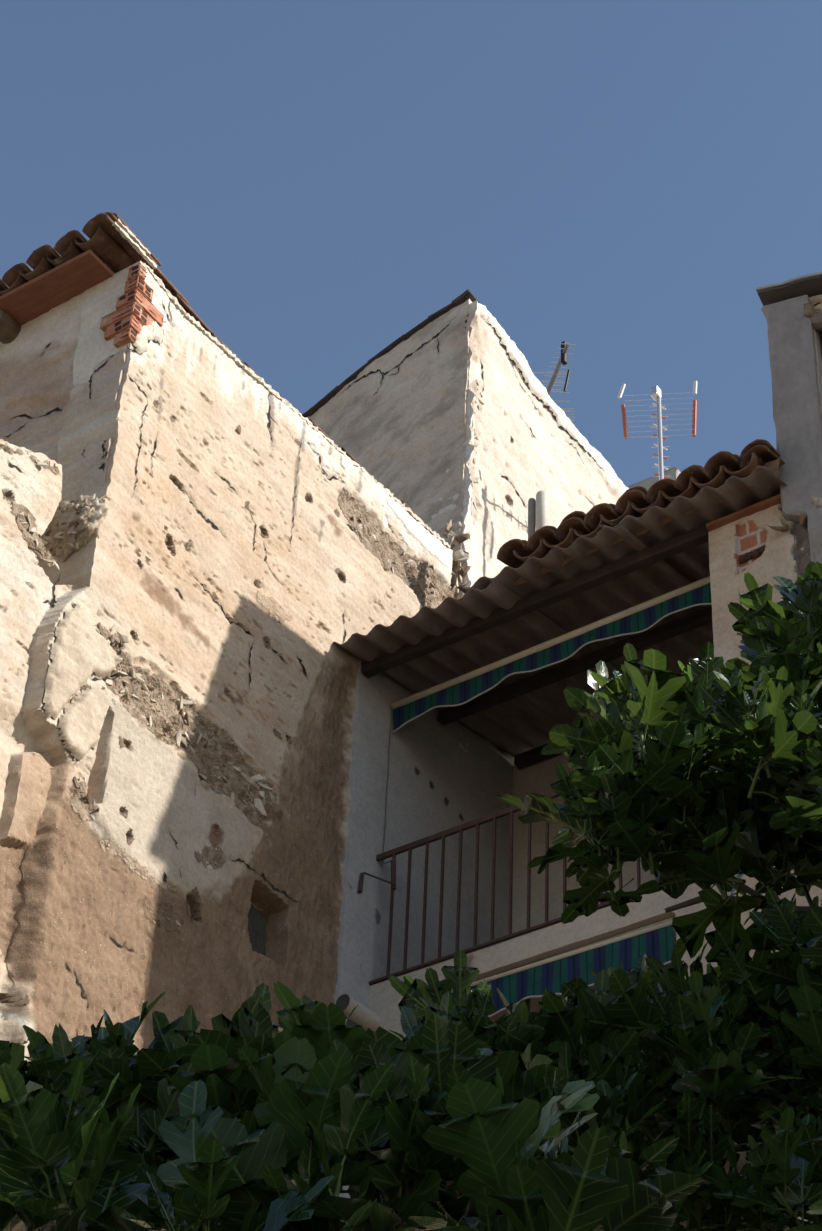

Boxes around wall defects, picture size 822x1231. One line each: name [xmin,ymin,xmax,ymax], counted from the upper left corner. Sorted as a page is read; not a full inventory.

spalling [100,263,164,354]
spalling [0,441,60,475]
crack [5,407,63,474]
spalling [10,500,60,570]
crack [82,440,107,471]
crack [88,302,174,497]
crack [182,490,223,535]
crack [215,393,345,585]
spalling [338,487,454,609]
crack [346,314,608,506]
spalling [734,520,767,574]
spalling [37,603,276,826]